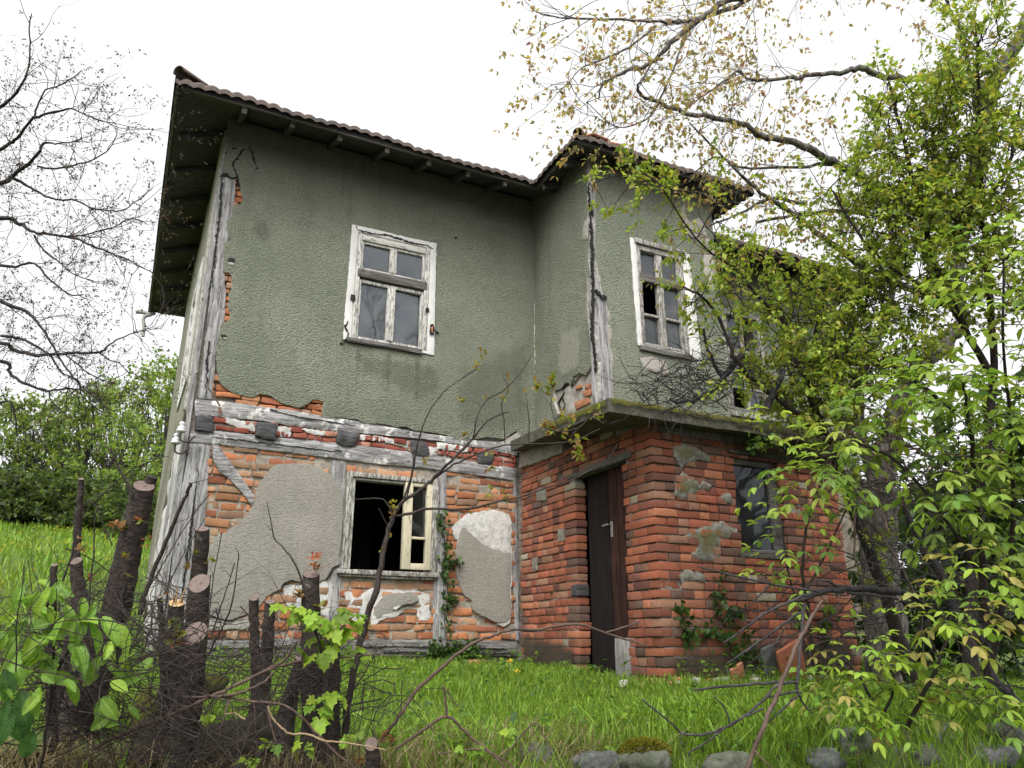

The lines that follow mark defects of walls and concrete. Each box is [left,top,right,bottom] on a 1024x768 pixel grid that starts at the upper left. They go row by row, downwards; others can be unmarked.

crack [211,145,257,287]
spalling [556,218,614,415]